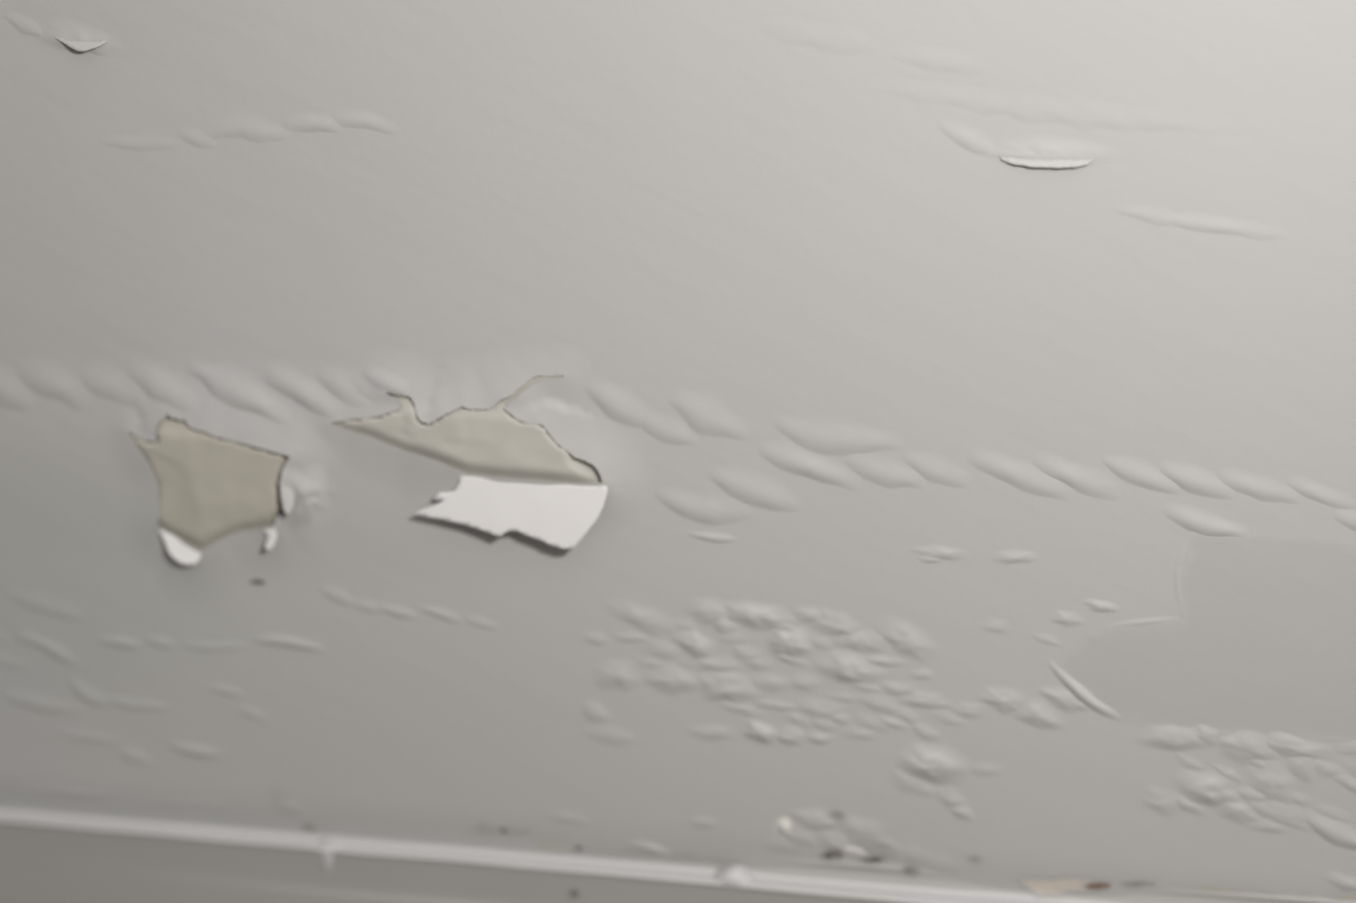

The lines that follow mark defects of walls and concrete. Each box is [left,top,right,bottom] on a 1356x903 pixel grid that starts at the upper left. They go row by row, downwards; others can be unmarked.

peeling [3,10,129,58]
peeling [937,118,1129,170]
peeling [98,338,660,615]